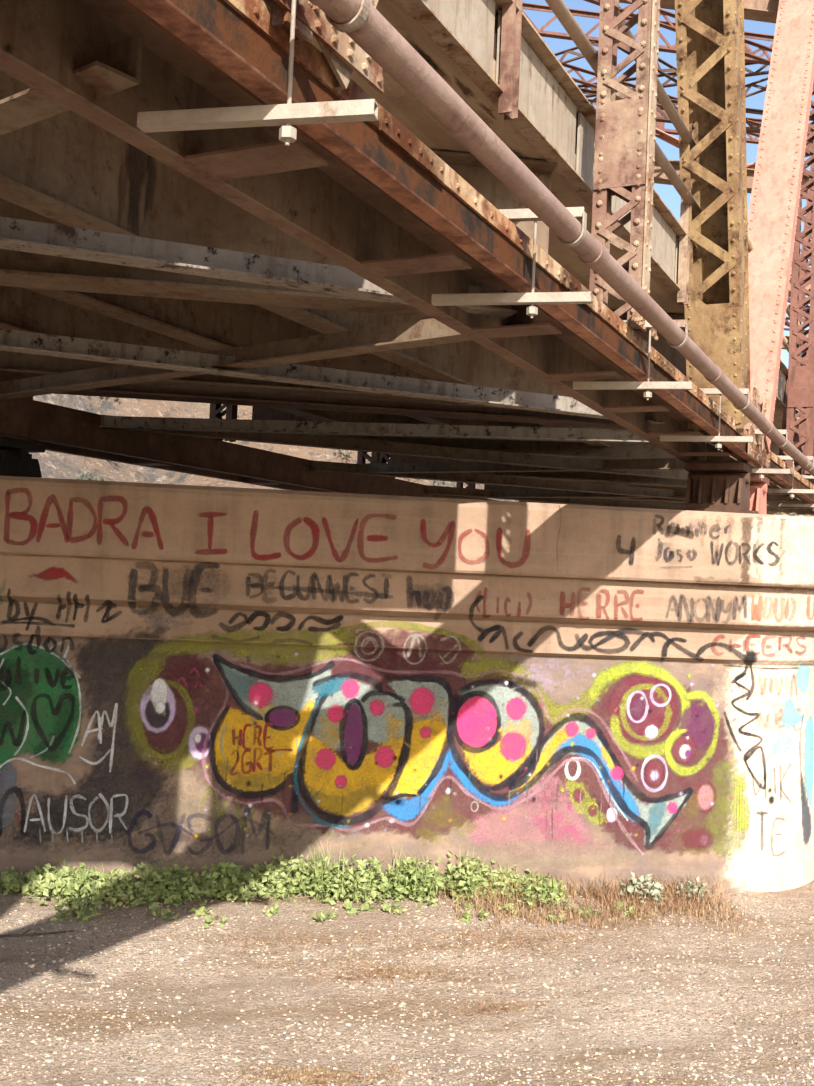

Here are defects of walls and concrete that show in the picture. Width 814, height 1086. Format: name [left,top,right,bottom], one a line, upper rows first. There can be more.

rust [119,144,156,229]